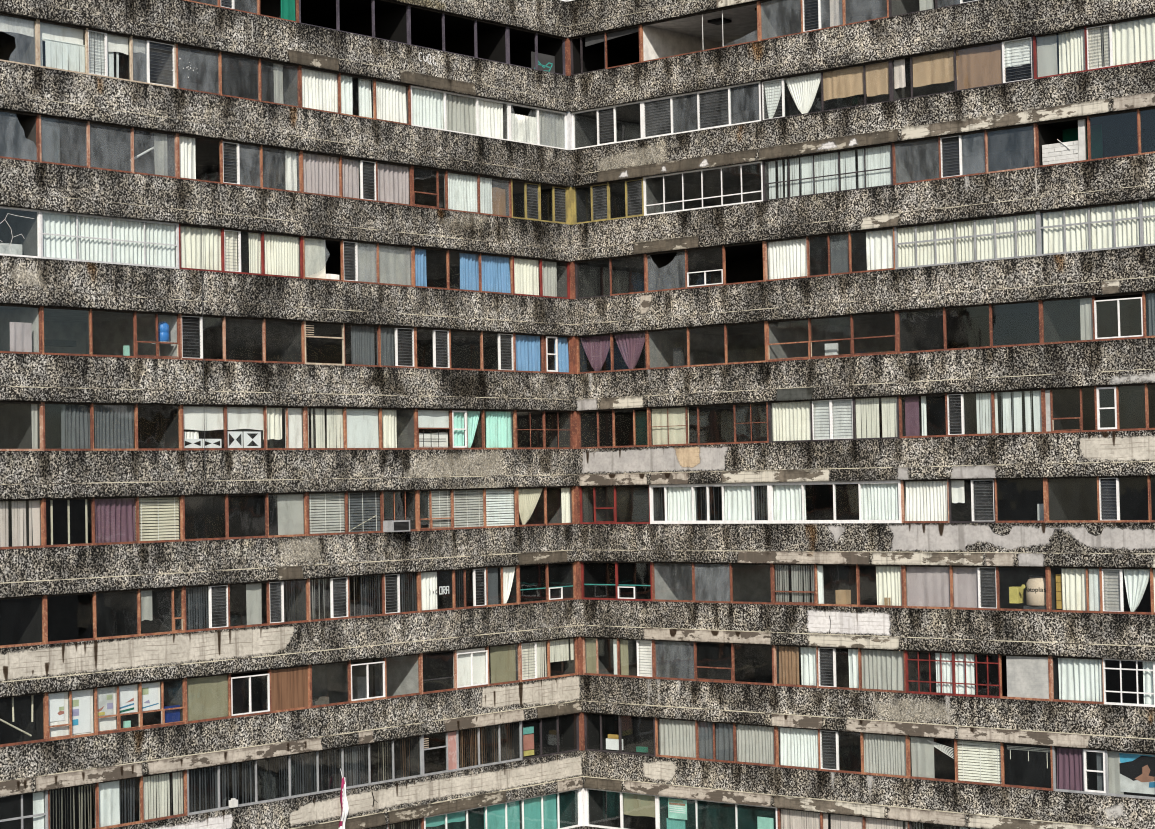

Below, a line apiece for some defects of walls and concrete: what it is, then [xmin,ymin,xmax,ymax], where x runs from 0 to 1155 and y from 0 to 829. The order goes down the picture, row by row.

peeling [818,138,857,149]
spalling [1074,432,1155,461]
spalling [804,609,891,645]
spalling [0,626,295,681]
spalling [481,676,580,711]
spalling [150,811,233,829]